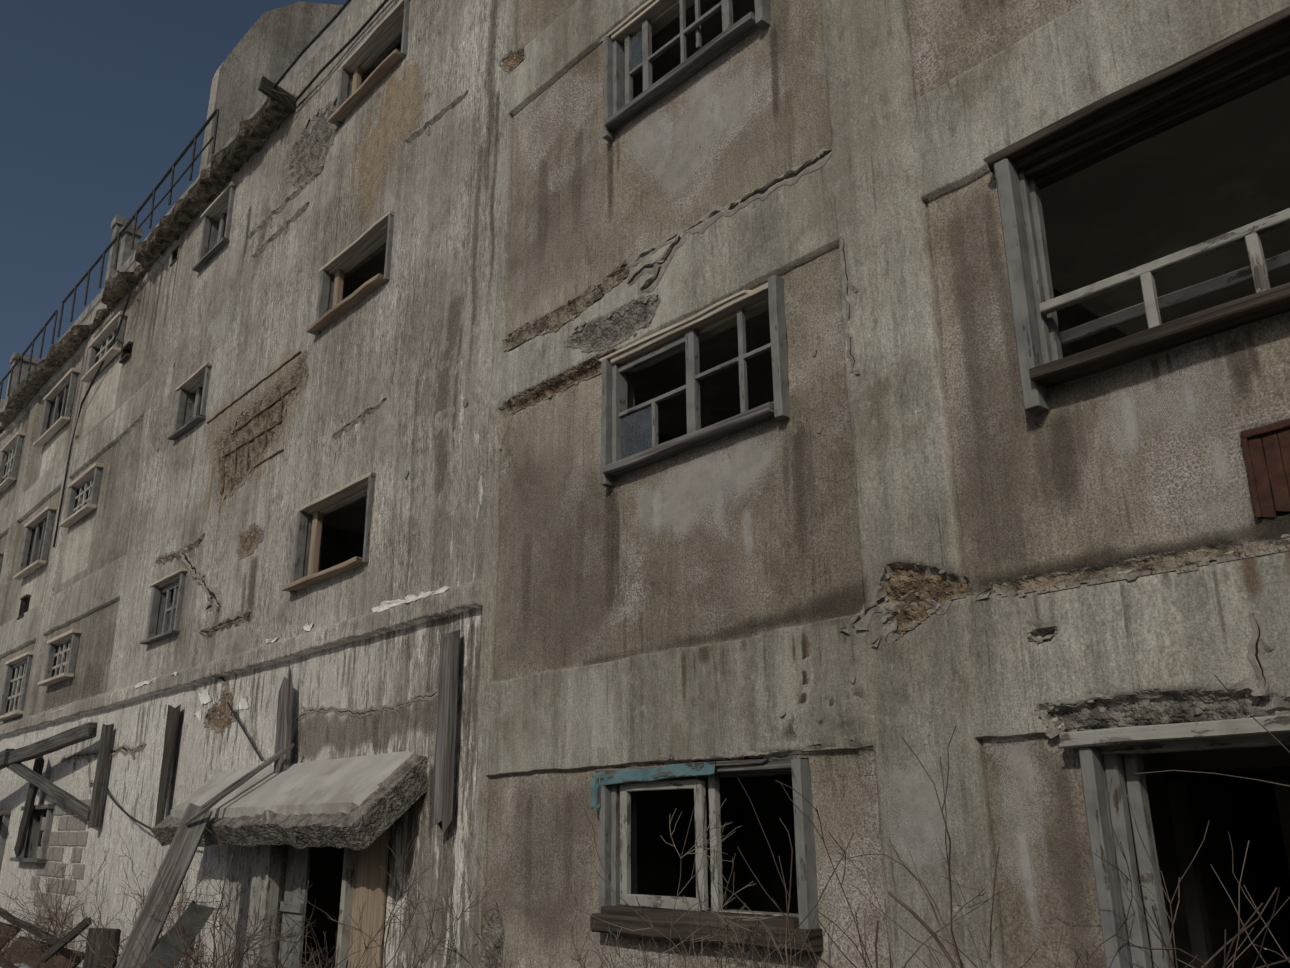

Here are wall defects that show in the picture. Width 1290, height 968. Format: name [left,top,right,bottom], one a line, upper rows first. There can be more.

damp [436,0,499,468]
crack [626,148,832,293]
spalling [502,262,660,415]
spalling [206,350,309,500]
damp [639,431,812,530]
crack [156,533,252,639]
damp [604,491,619,591]
damp [721,587,864,635]
spalling [838,534,1290,647]
spalling [194,671,249,733]
spalling [1034,688,1290,739]